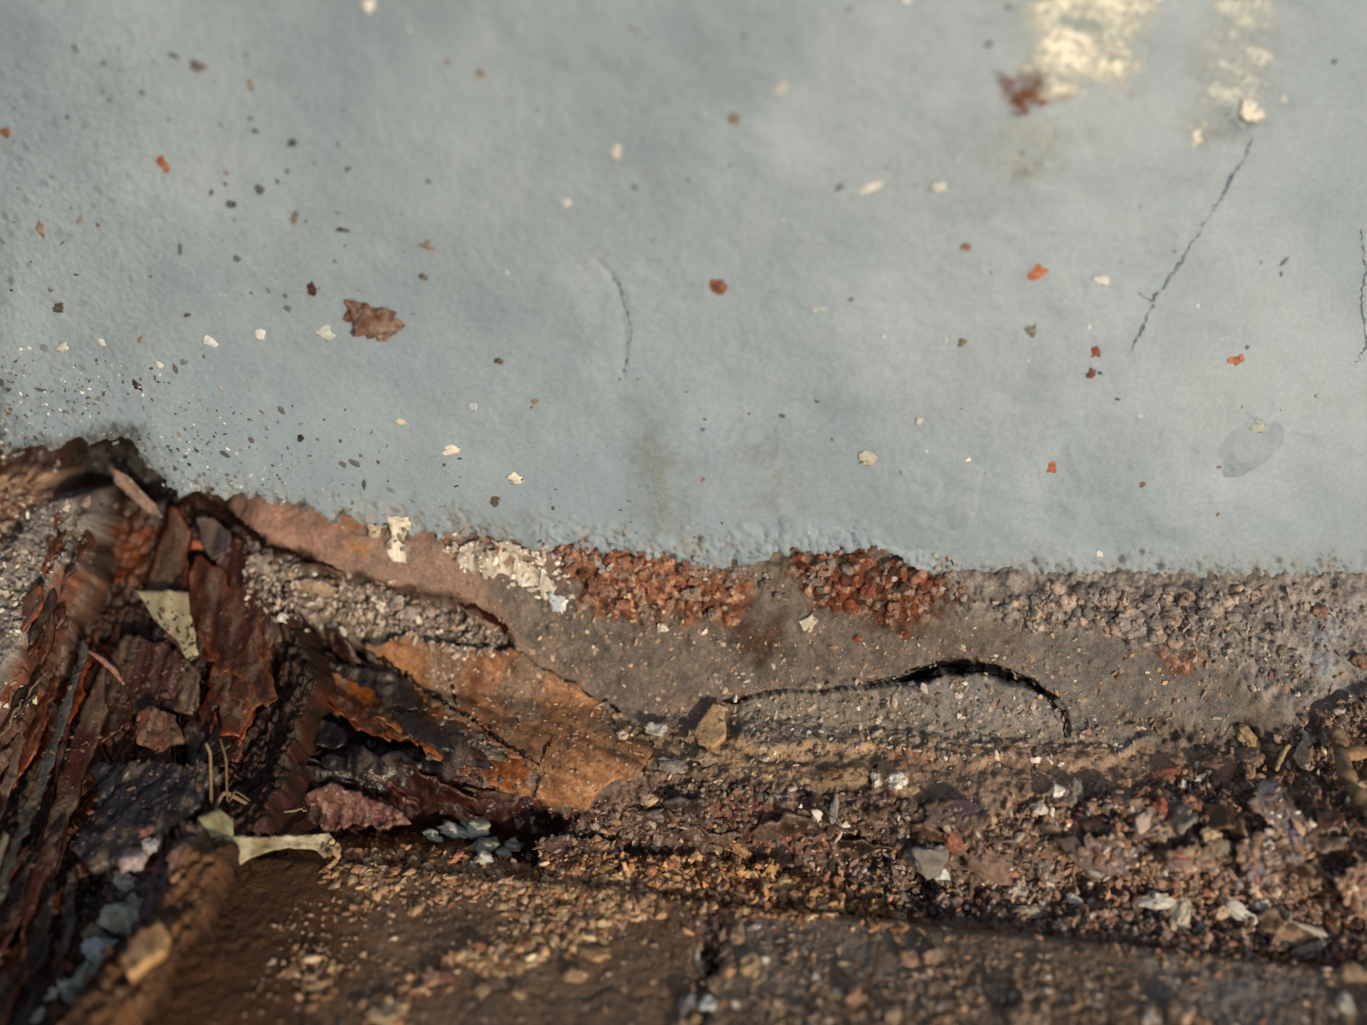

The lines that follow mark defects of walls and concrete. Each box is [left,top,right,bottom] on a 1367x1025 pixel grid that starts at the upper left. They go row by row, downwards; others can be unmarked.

crack [1132,137,1253,350]
peeling [365,514,412,564]
spalling [254,552,336,597]
peeling [135,590,199,659]
spalling [393,595,422,619]
crack [720,695,748,706]
crack [852,659,1069,738]